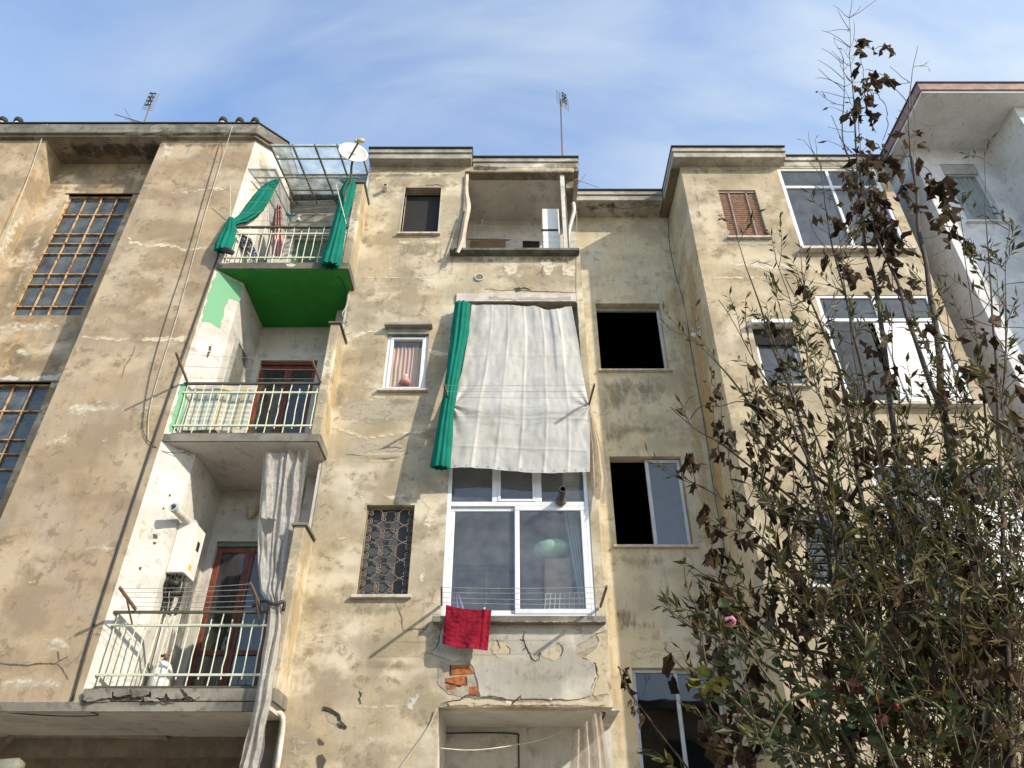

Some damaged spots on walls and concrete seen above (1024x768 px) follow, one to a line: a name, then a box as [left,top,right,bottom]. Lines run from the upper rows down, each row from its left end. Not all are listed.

peeling [201,262,242,328]
crack [496,631,541,663]
crack [0,651,69,680]
peeling [430,621,610,706]
spalling [83,688,200,704]
flaking render [322,705,349,729]